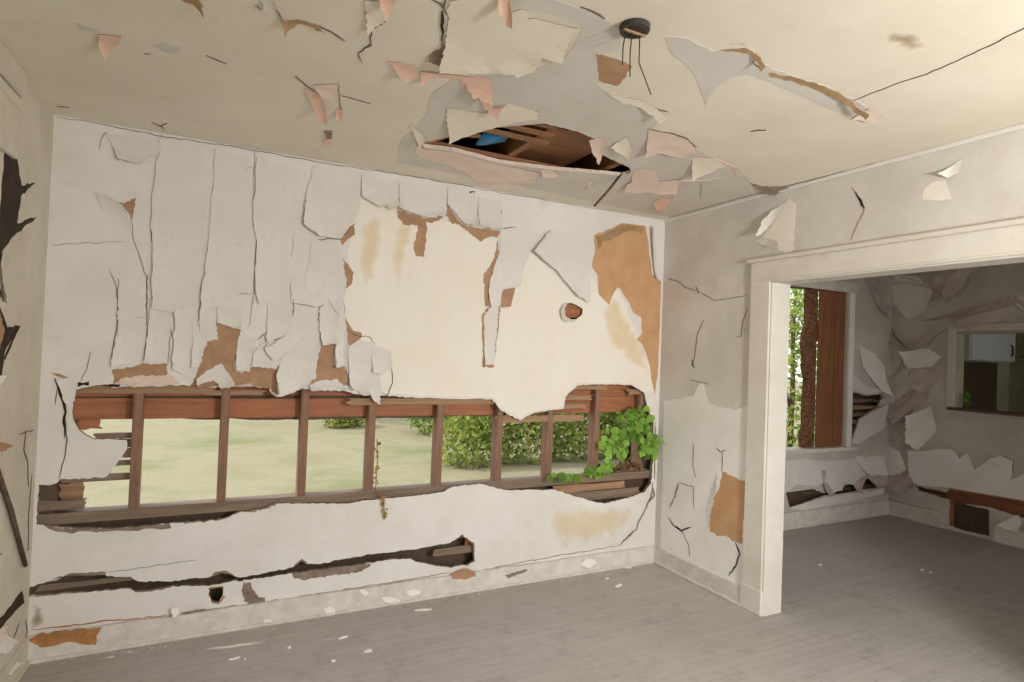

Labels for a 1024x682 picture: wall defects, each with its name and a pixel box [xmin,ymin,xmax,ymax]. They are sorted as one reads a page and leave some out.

peeling [387,0,579,150]
crack [854,28,1024,101]
crack [56,106,873,240]
peeling [589,94,736,211]
spalling [0,153,36,385]
peeling [96,139,661,417]
peeling [784,267,1024,510]
spalling [0,591,25,676]
spalling [170,571,265,618]
spalling [292,559,371,581]
crack [484,444,725,570]
spalling [660,383,747,585]